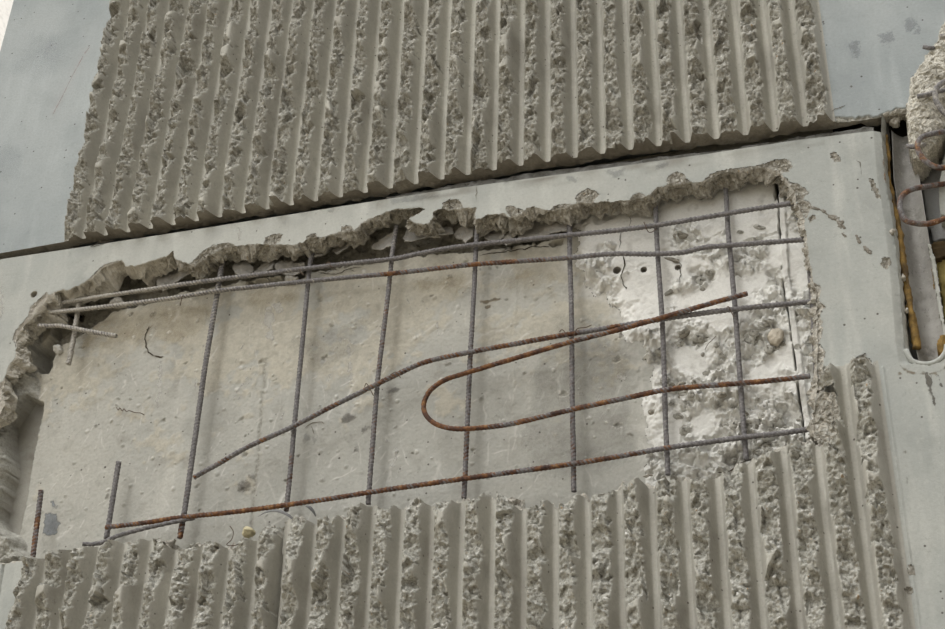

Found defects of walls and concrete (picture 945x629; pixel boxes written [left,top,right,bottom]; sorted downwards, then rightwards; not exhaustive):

spalling [833,22,945,227]
spalling [0,159,840,448]